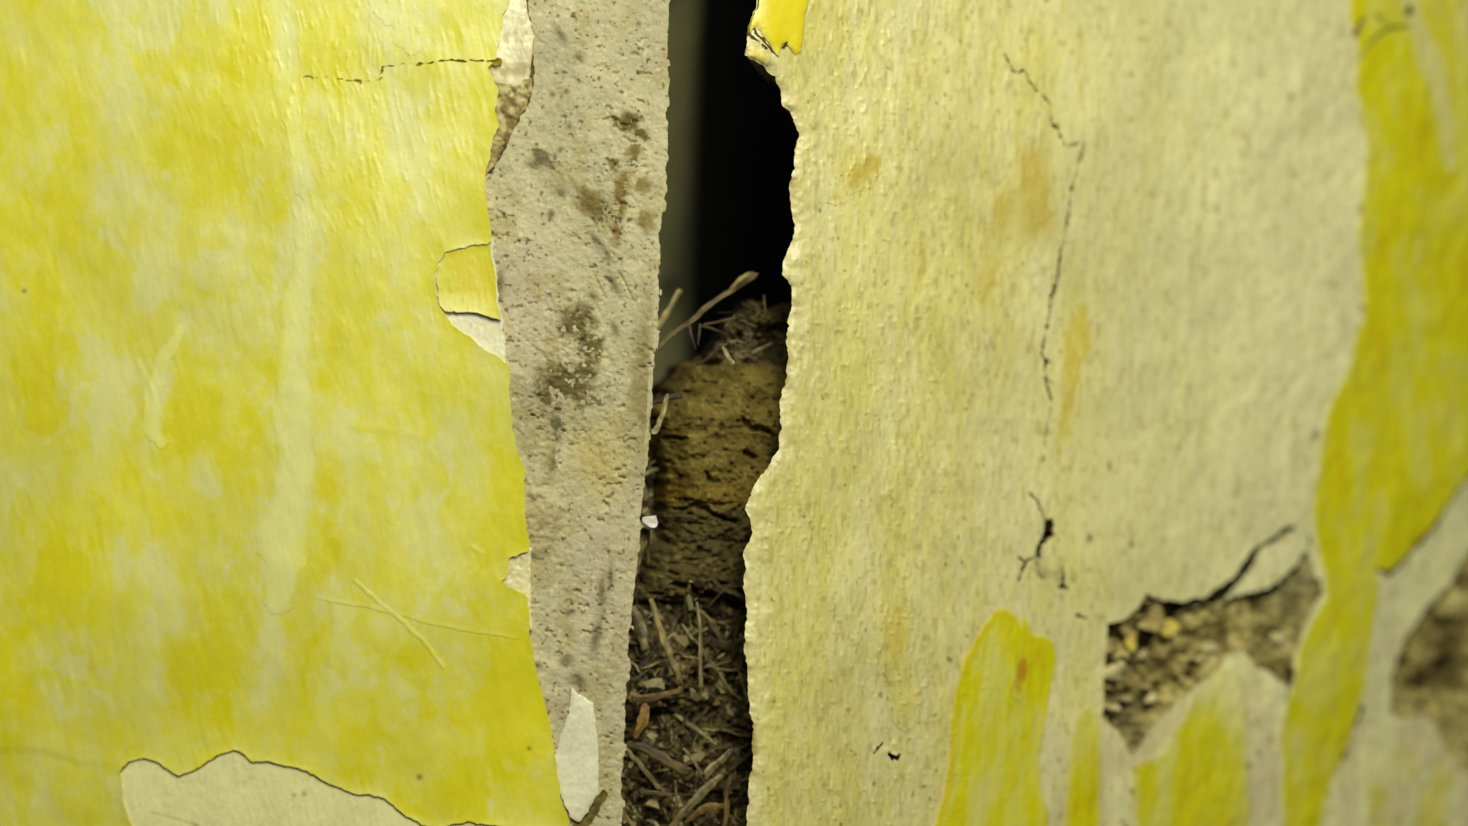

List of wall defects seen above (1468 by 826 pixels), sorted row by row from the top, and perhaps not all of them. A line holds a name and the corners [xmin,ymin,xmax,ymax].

crack [304,58,502,84]
peeling [746,0,809,66]
damp [563,102,662,258]
spalling [434,0,670,826]
damp [605,259,656,488]
peeling [933,0,1468,826]
peeling [120,750,425,826]